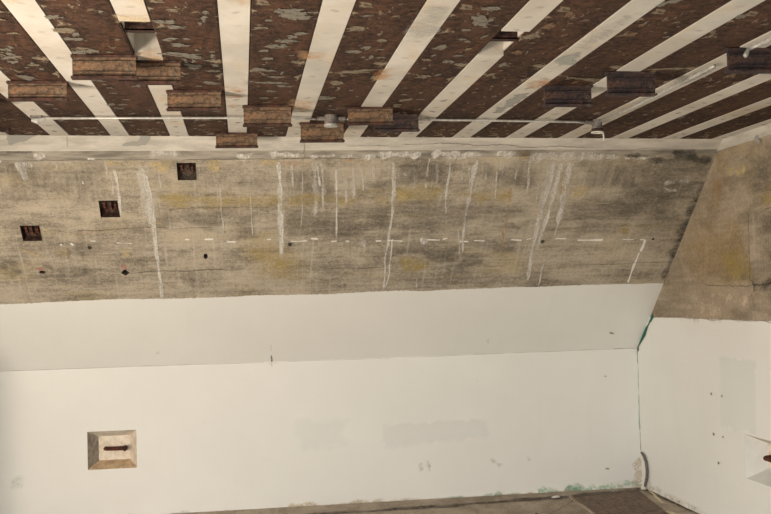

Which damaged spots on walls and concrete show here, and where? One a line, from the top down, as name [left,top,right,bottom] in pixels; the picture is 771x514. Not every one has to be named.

peeling [151,9,222,87]
peeling [248,32,310,103]
peeling [254,8,318,28]
peeling [317,15,387,122]
peeling [443,6,500,64]
peeling [462,11,573,113]
water stain [105,161,122,215]
water stain [137,163,167,297]
water stain [260,160,318,268]
water stain [376,163,415,288]
water stain [511,162,585,285]
crack [598,267,771,448]